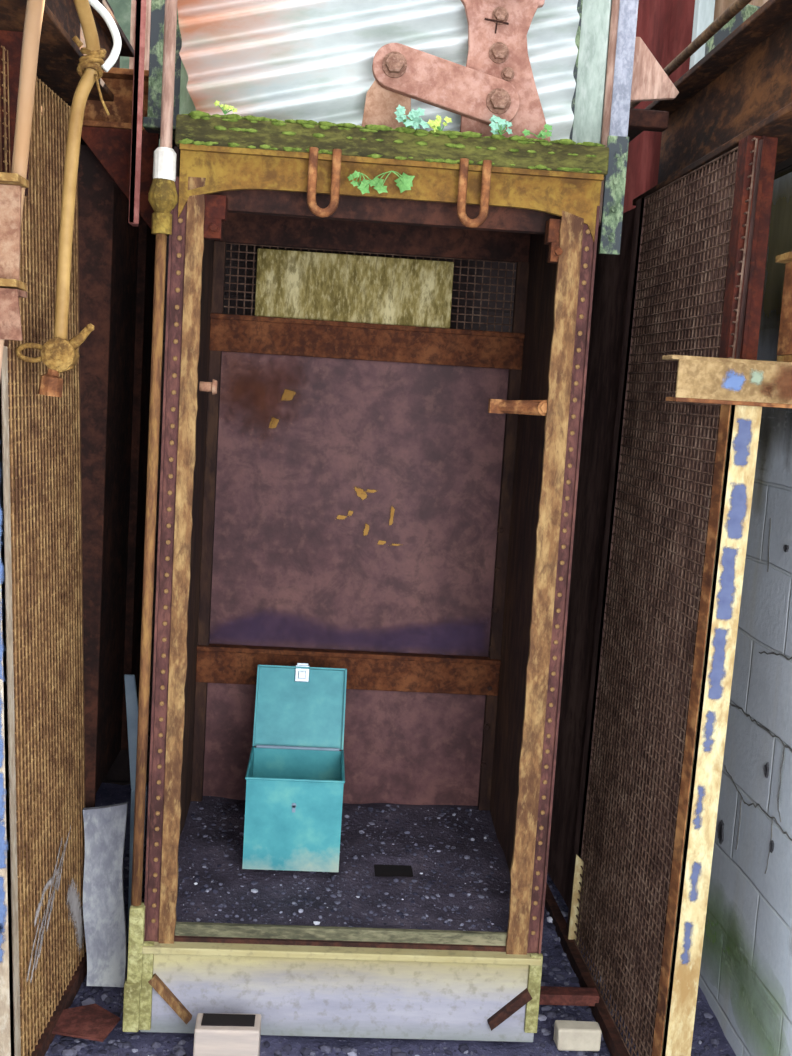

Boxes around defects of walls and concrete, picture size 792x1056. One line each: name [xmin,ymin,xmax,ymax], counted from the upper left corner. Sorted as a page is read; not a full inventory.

mould [704,907,737,966]